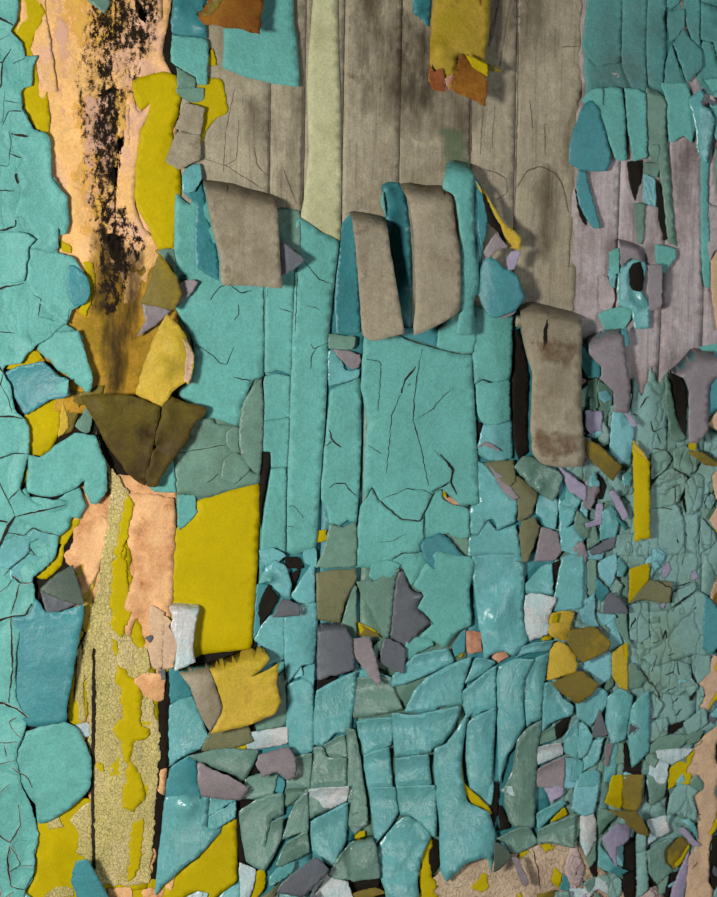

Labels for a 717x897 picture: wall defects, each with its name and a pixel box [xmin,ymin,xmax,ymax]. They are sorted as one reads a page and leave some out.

crack [0,367,23,419]
crack [0,17,28,192]
crack [0,283,41,316]
crack [40,353,61,374]
water stain [75,0,159,393]
flaking render [0,0,300,897]
crack [210,264,328,327]
crack [330,353,457,560]
peeling [168,182,717,897]
peeling [412,0,504,106]
peeling [569,0,717,347]
crack [0,483,65,897]